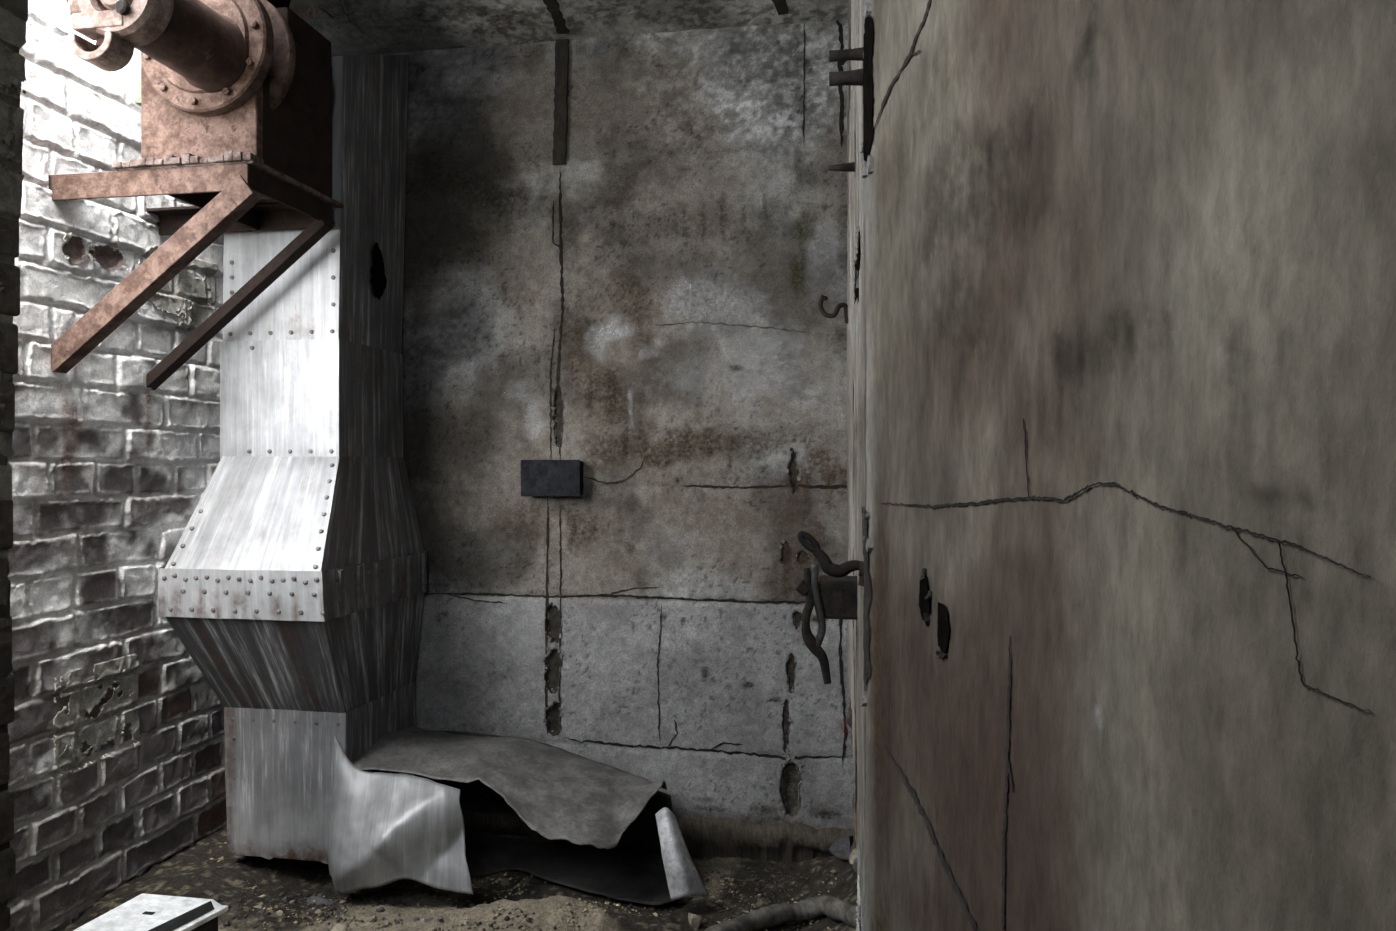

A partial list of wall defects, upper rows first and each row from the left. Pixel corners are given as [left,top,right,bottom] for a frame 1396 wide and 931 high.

spalling [853,226,861,304]
spalling [551,388,564,448]
spalling [785,447,801,493]
spalling [779,539,810,565]
crack [681,419,1371,712]
spalling [792,611,802,632]
hole [919,568,949,659]
spalling [542,603,564,736]
spalling [762,653,830,818]